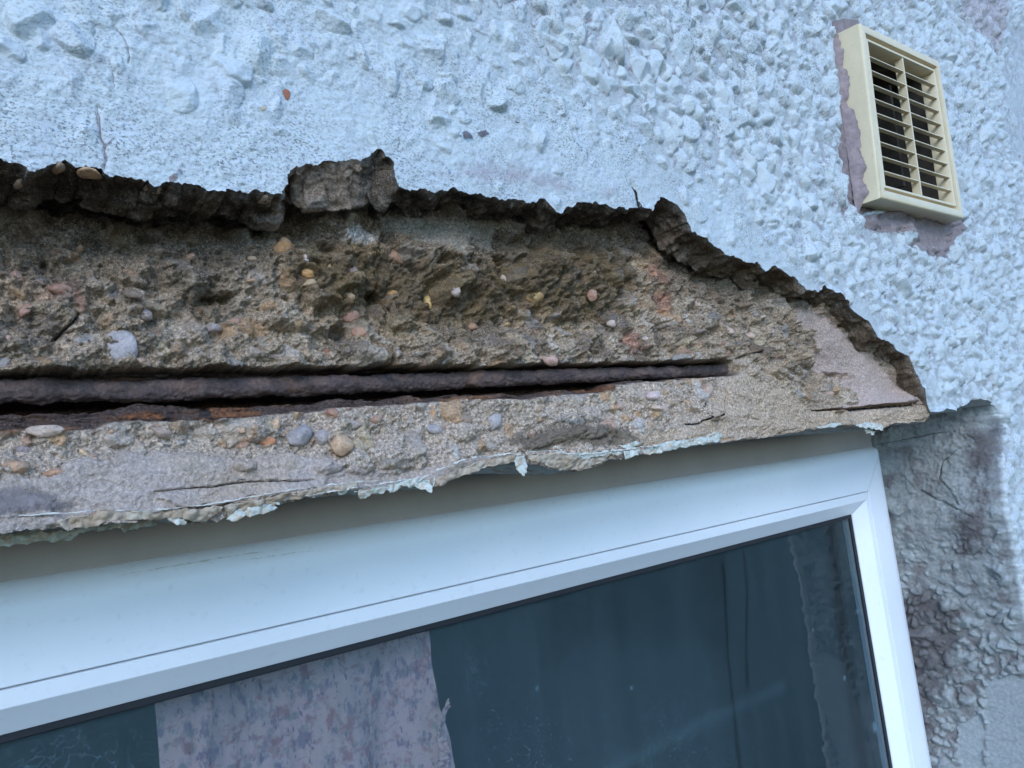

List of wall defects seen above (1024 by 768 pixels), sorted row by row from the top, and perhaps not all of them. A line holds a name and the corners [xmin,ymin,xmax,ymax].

peeling [832,18,859,34]
peeling [832,105,967,265]
spalling [0,149,930,547]
corrosion [194,407,259,420]
crack [157,479,308,492]